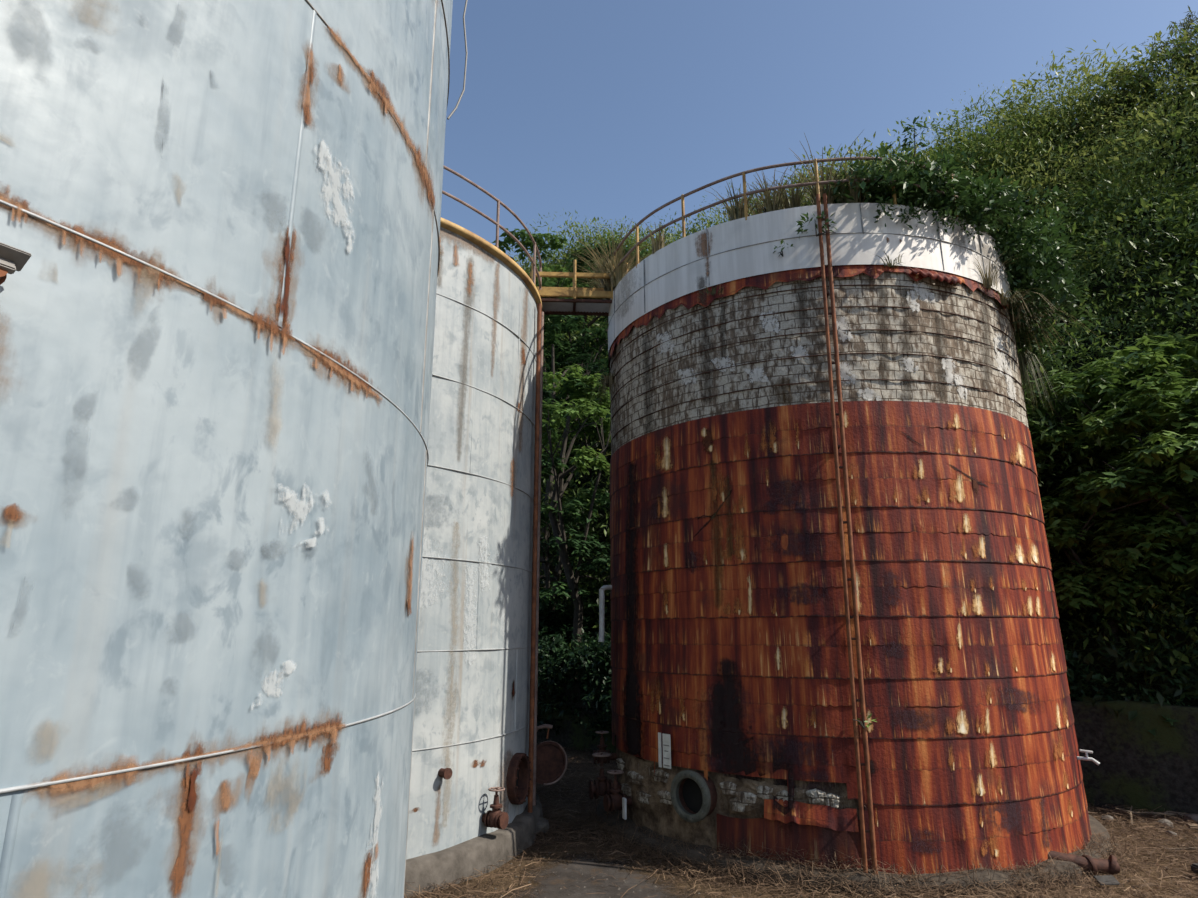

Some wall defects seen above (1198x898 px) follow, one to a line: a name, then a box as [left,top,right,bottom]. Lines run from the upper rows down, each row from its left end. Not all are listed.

corrosion [303,49,314,124]
corrosion [328,27,435,206]
peeling [319,140,353,252]
corrosion [0,191,382,401]
damp [699,278,726,402]
damp [879,287,911,399]
damp [936,317,946,399]
damp [983,293,992,387]
peeling [279,487,329,547]
corrosion [33,715,345,896]
peeling [616,758,673,805]
peeling [720,781,840,812]